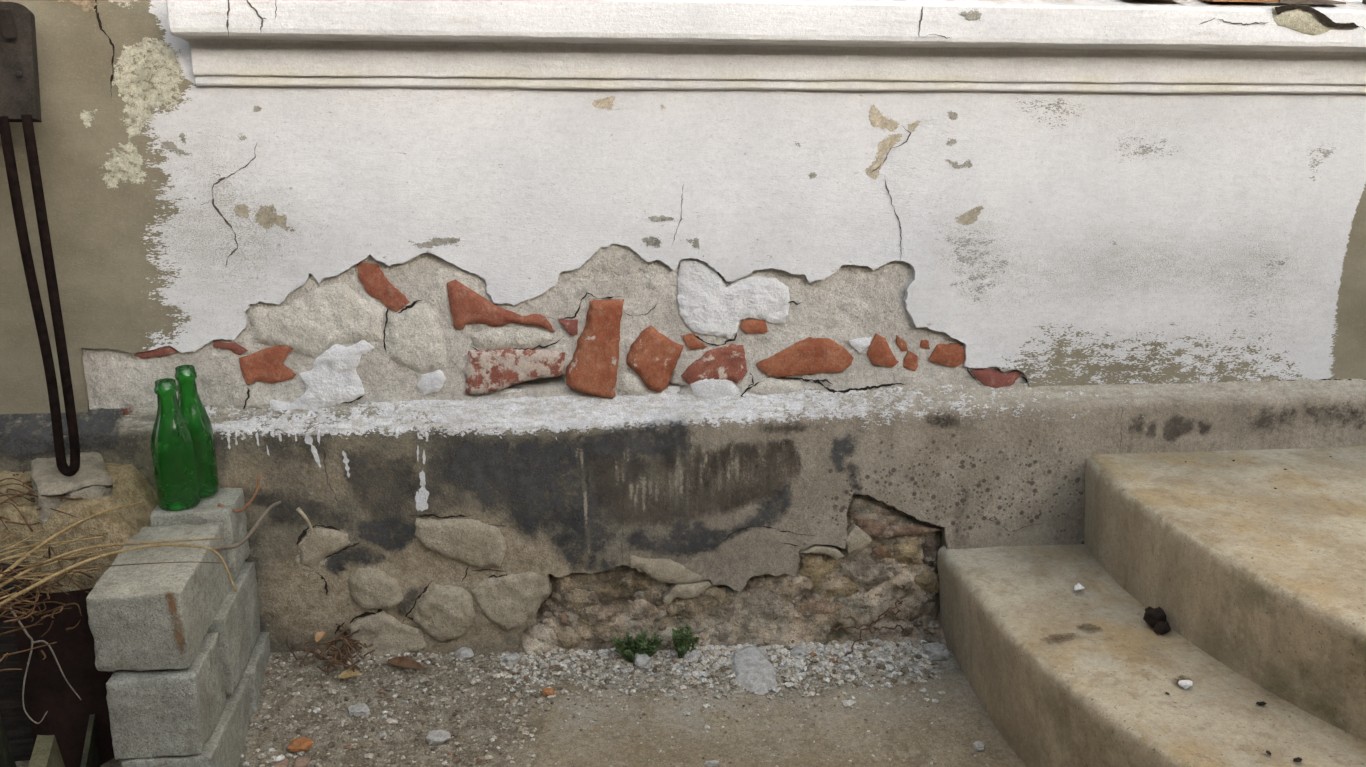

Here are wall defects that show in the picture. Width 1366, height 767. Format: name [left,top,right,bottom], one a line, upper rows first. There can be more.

crack [226,0,277,37]
crack [1199,17,1268,25]
flaking render [1272,4,1359,35]
peeling [99,37,184,189]
crack [202,143,257,265]
crack [872,128,911,259]
flaking render [83,215,1026,411]
leakage [235,430,327,455]
leakage [244,432,429,575]
leakage [443,419,806,571]
leakage [1129,415,1211,441]
flaking render [346,494,946,656]